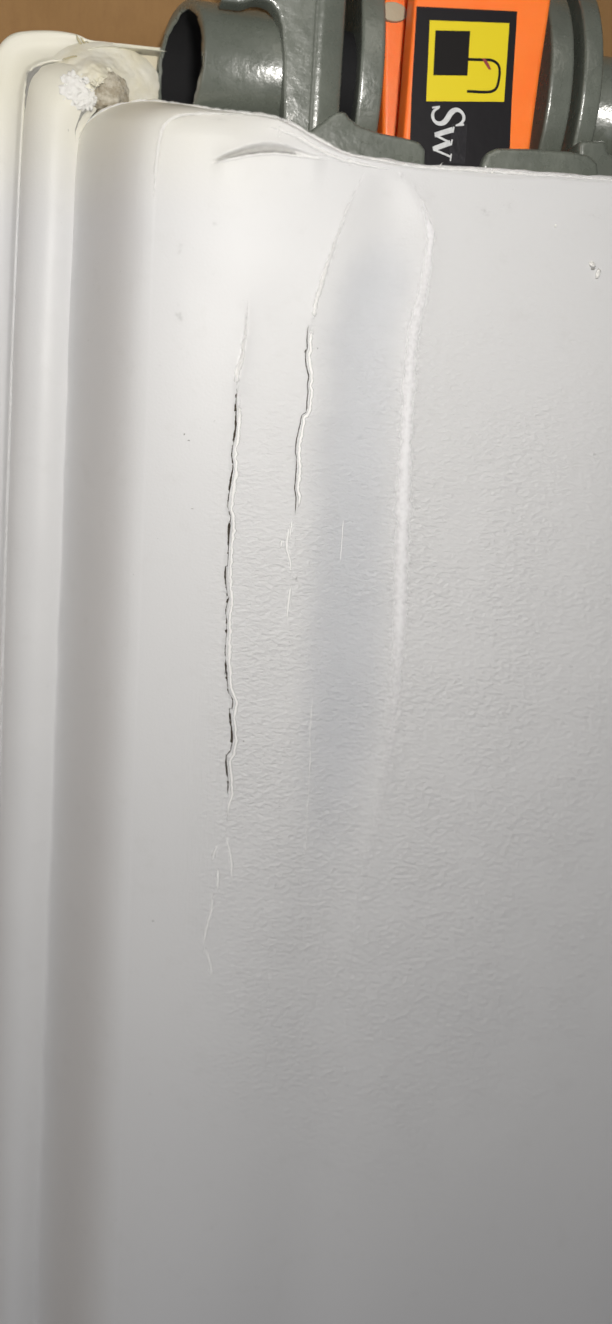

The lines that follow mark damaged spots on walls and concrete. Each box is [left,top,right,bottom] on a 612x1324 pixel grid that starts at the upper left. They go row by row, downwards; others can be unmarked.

crack [203,344,244,980]
crack [280,246,334,623]